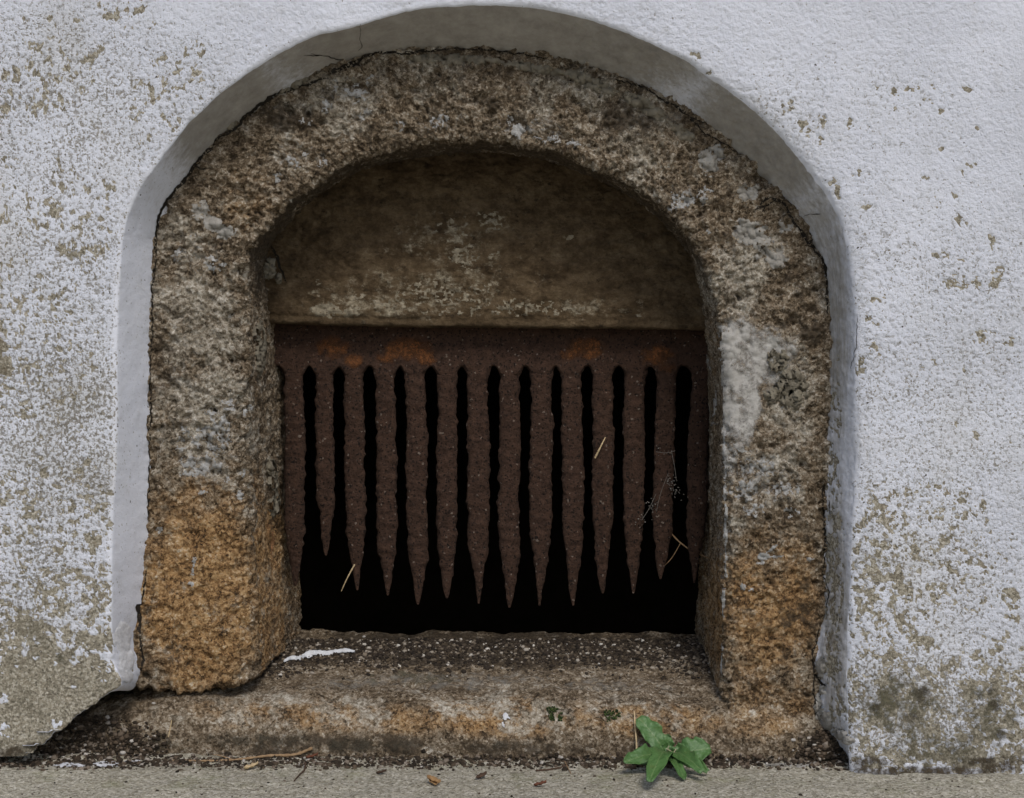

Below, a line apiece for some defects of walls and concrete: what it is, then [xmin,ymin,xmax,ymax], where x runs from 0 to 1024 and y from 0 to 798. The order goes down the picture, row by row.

peeling [0,15,105,119]
peeling [781,99,827,145]
peeling [875,84,945,115]
peeling [828,177,841,200]
peeling [0,157,118,439]
peeling [942,266,1013,292]
peeling [972,329,1015,347]
peeling [807,378,1024,775]
leakage [862,672,938,733]
leakage [967,688,1013,739]
leakage [848,731,1024,775]